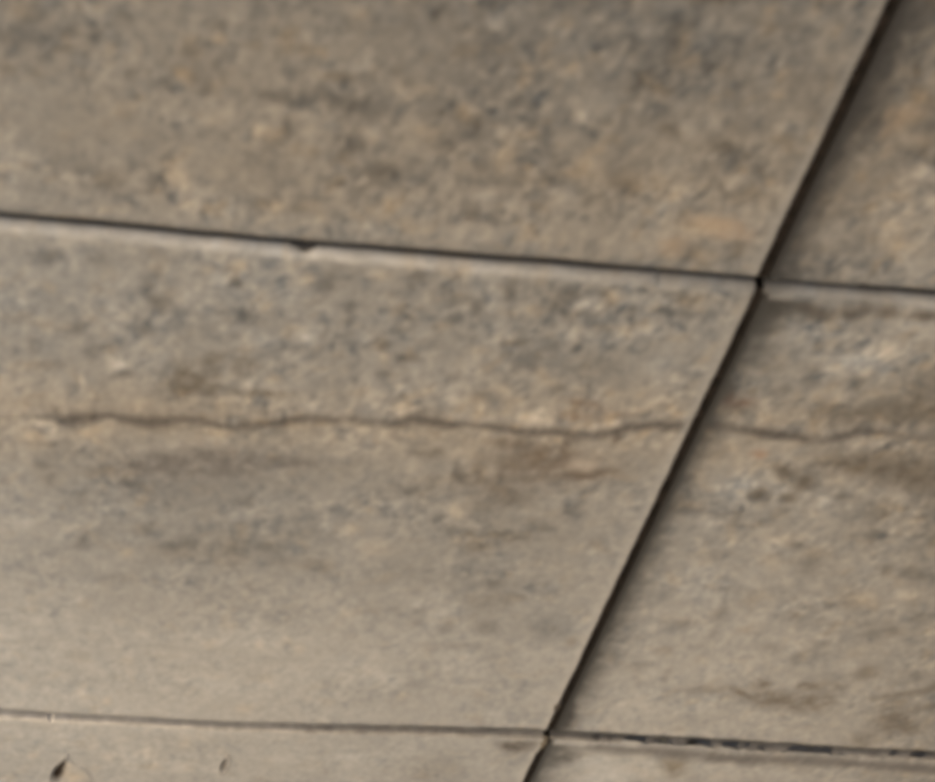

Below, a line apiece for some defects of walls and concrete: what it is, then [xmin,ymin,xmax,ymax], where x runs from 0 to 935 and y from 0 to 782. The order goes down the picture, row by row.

crack [0,405,935,447]